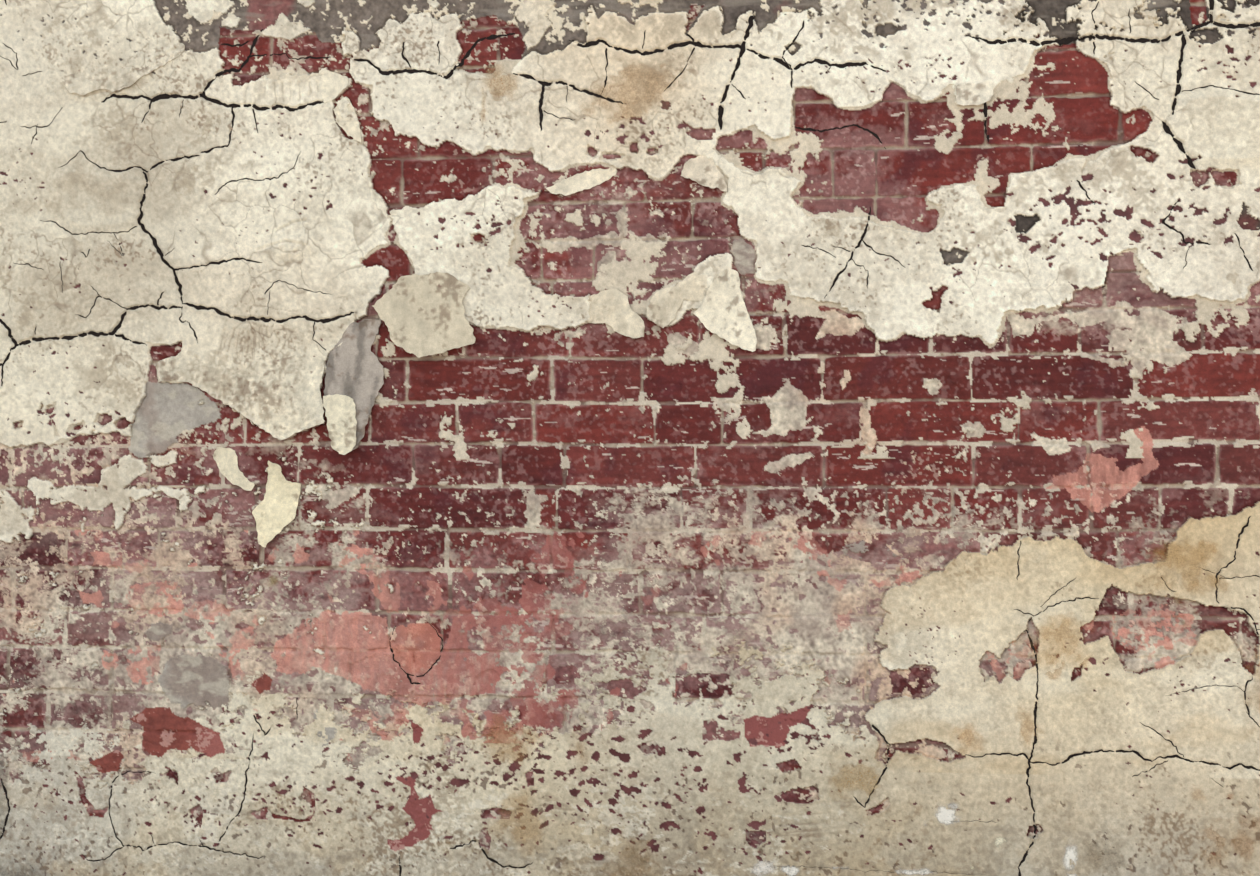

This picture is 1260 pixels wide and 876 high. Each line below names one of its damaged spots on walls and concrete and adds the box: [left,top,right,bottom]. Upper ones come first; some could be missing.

crack [513,15,886,132]
crack [966,0,1260,169]
crack [0,29,515,386]
peeling [61,0,1260,455]
crack [802,207,906,298]
peeling [213,447,301,548]
peeling [130,708,226,758]
crack [83,699,298,862]
peeling [744,706,810,749]
spalling [872,662,941,701]
crack [767,541,1260,876]
spalling [1080,585,1260,683]